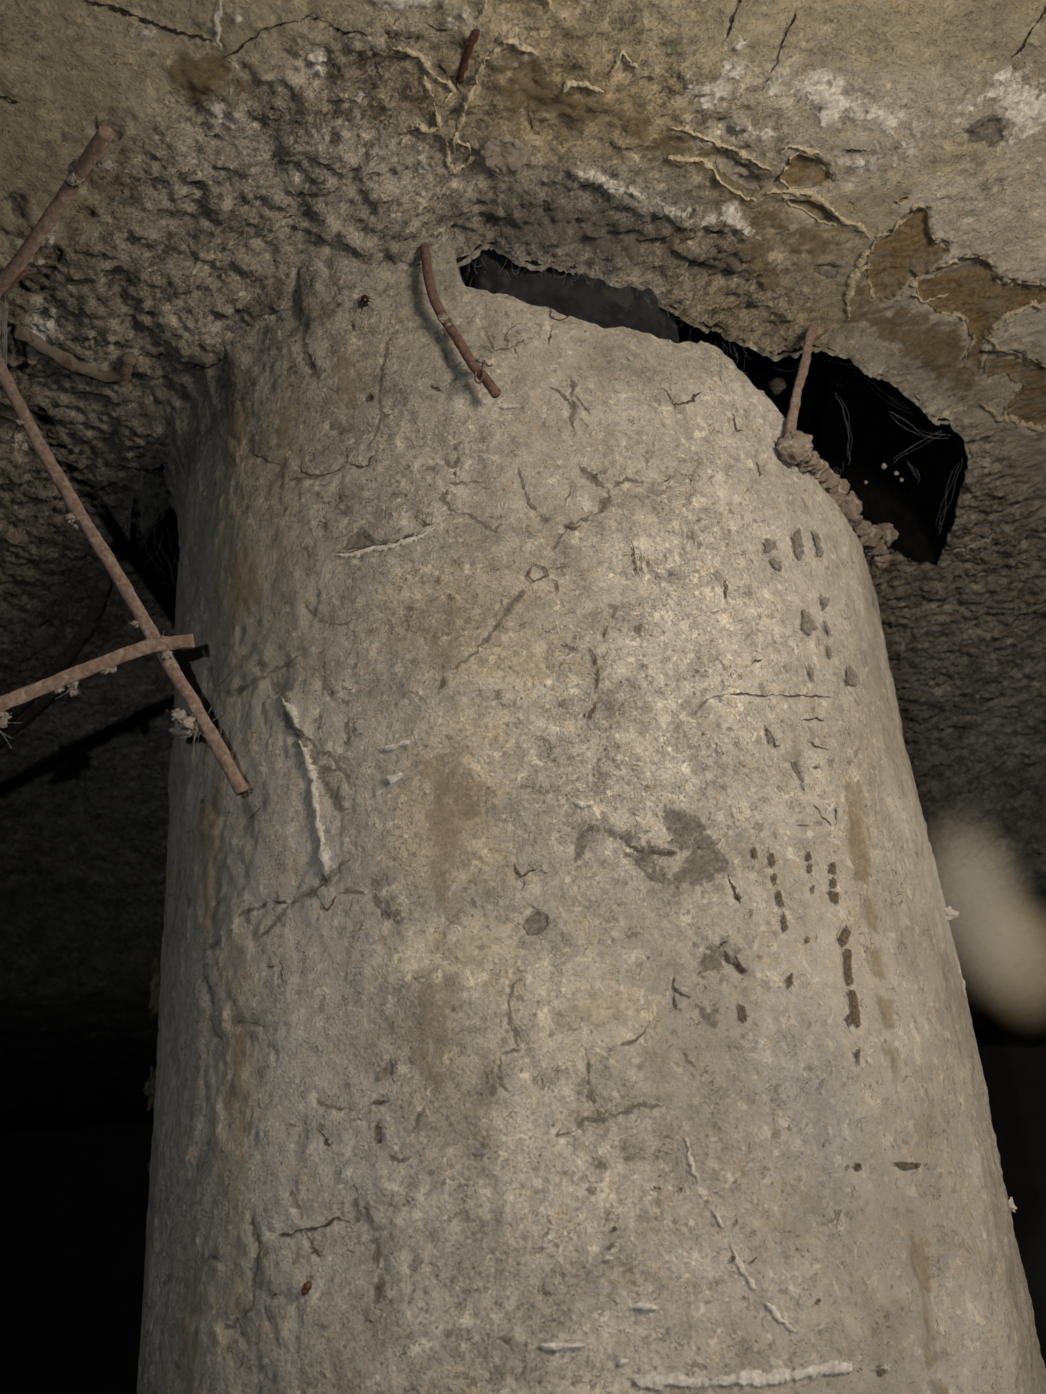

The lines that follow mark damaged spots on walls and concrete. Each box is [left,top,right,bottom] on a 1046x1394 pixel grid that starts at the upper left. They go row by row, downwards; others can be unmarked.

crack [82,0,383,83]
water stain [307,49,327,75]
crack [1012,7,1046,58]
water stain [687,41,1046,182]
water stain [393,37,979,400]
crack [306,604,354,625]
crack [208,651,352,813]